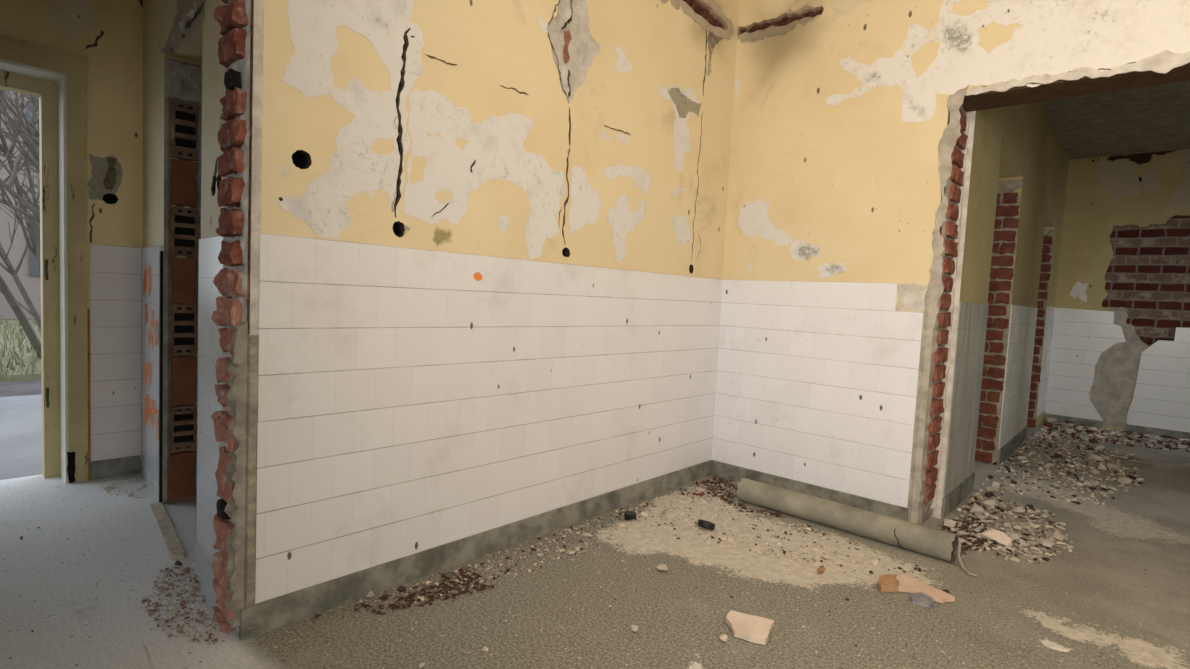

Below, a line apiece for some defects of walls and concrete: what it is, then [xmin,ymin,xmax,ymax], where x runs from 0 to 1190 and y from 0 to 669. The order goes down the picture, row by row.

spalling [87,153,123,243]
spalling [160,0,253,504]
crack [391,28,415,235]
peeling [277,0,651,262]
crack [548,0,573,243]
peeling [658,84,701,172]
peeling [672,215,692,245]
crack [691,29,721,263]
peeling [738,197,847,279]
peeling [825,0,1190,525]
flaking render [212,514,236,634]